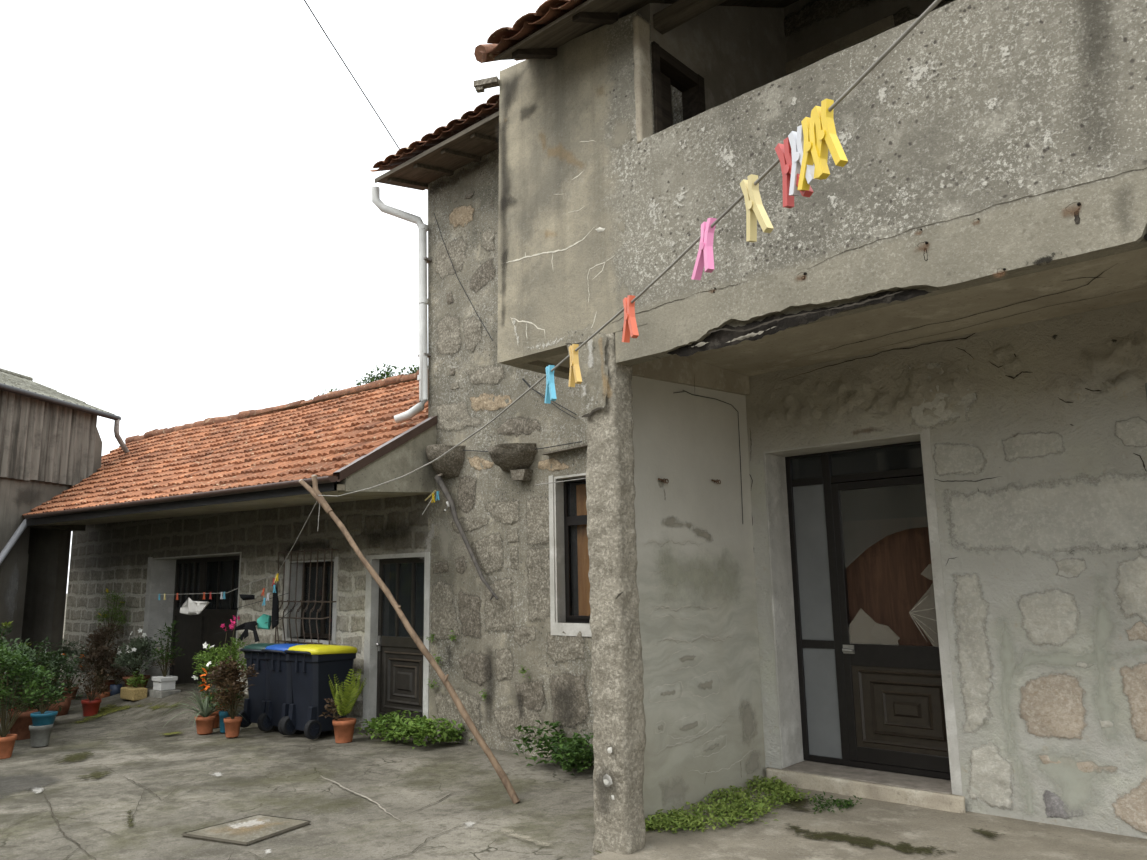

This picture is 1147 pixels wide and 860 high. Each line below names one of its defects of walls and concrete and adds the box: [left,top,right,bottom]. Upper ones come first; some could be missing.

crack [502,207,589,267]
crack [800,167,1147,270]
crack [511,318,545,346]
crack [587,256,746,332]
spalling [667,289,931,357]
flaking render [945,471,1147,641]
flaking render [1019,673,1114,739]
flaking render [1120,663,1147,741]
flaking render [968,741,1014,810]
flaking render [1043,790,1083,819]
flaking render [1112,779,1147,833]